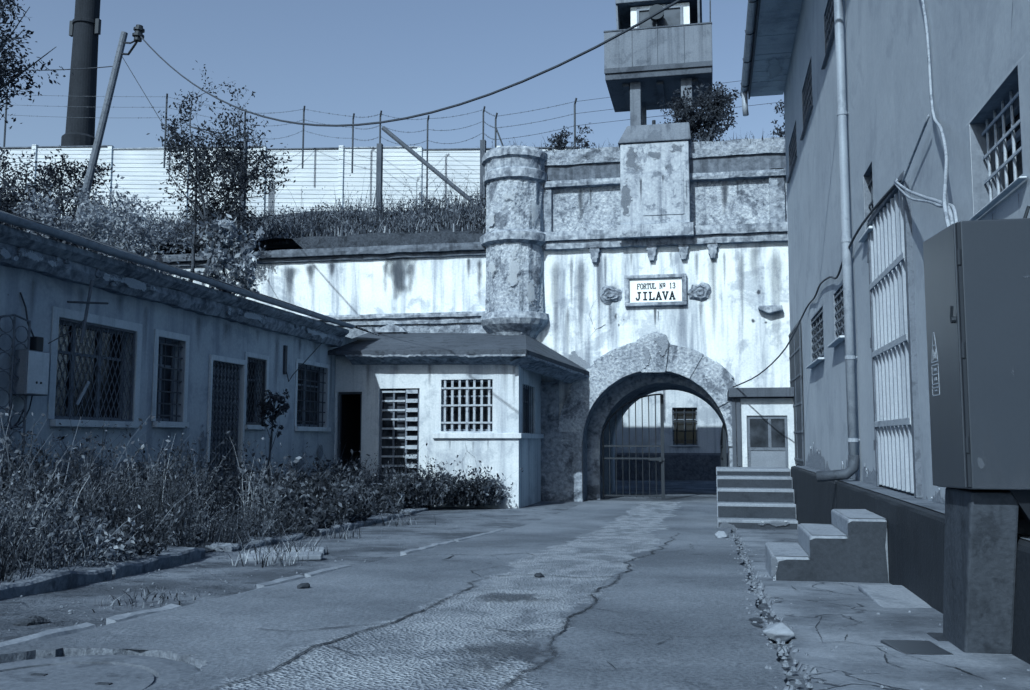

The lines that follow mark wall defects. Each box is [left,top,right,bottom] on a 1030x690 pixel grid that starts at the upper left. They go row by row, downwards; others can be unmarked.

water stain [384,258,413,291]
crack [211,553,529,690]
crack [473,535,702,688]
crack [791,585,986,679]